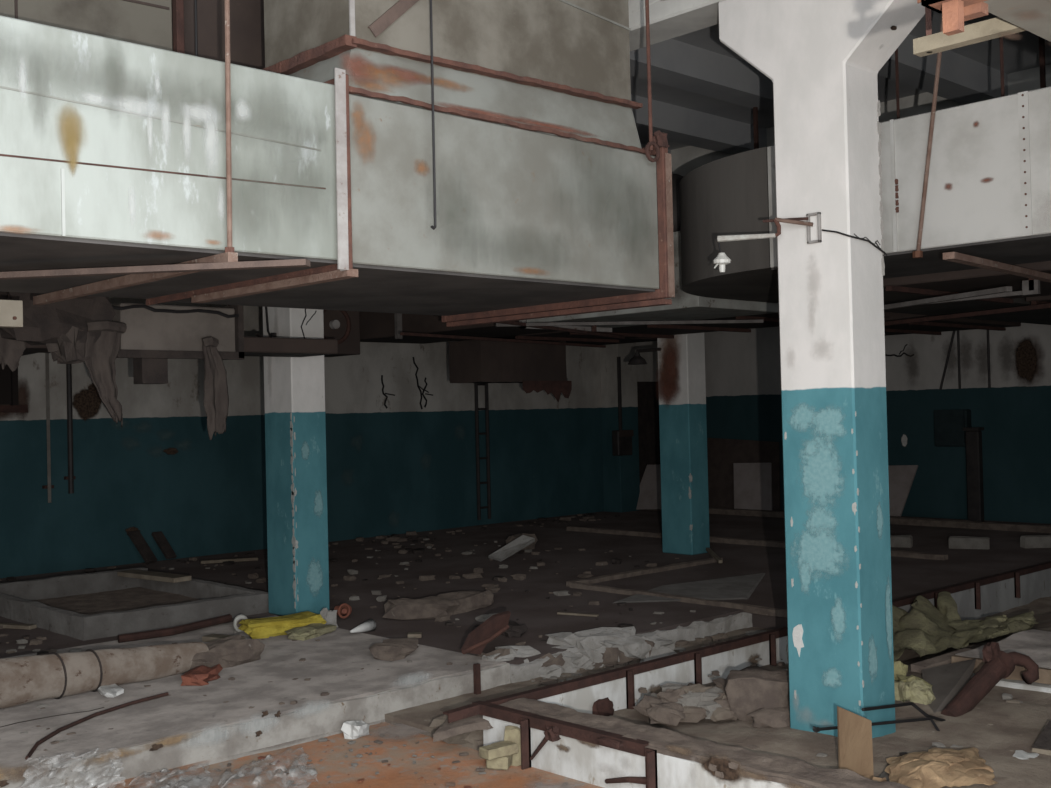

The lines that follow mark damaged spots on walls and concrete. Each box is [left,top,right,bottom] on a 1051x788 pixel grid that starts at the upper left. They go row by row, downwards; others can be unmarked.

corrosion [345,57,457,89]
corrosion [64,119,78,168]
corrosion [446,105,589,135]
crack [381,357,433,409]
corrosion [659,338,677,400]
peeling [290,413,323,609]
peeling [784,404,857,591]
spalling [793,624,804,657]
peeling [823,668,841,687]